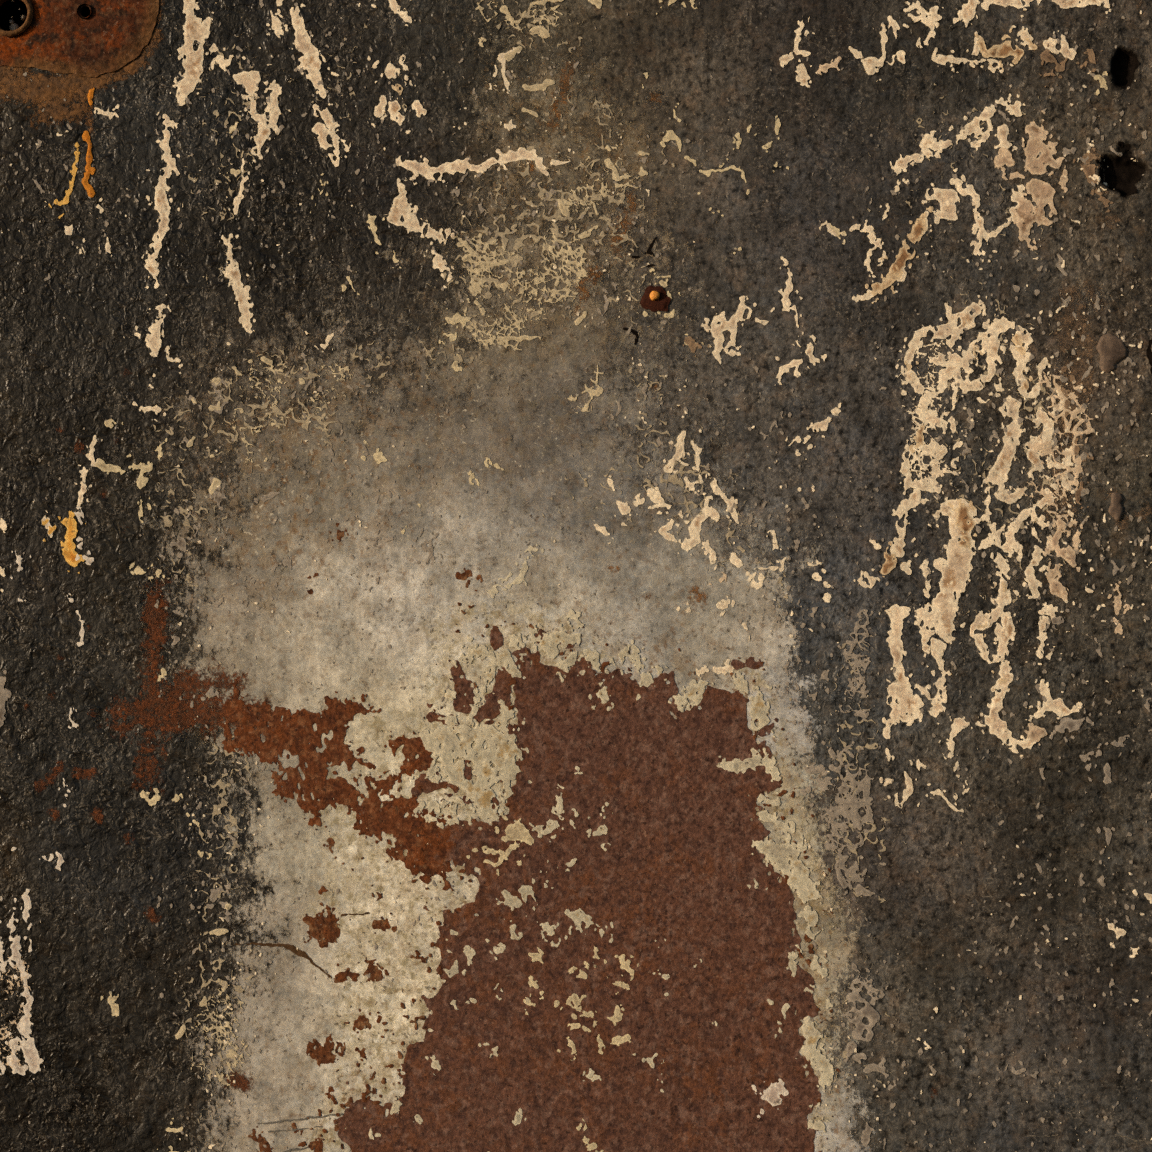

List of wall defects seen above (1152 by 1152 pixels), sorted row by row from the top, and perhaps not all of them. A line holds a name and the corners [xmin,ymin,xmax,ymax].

rust [0,0,163,198]
spalling [779,0,1140,95]
peeling [819,94,1144,304]
peeling [39,0,889,1152]
rust [455,568,483,591]
peeling [854,295,1099,812]
peeling [0,670,12,727]
rust [91,580,835,1152]
peeling [0,889,45,1079]